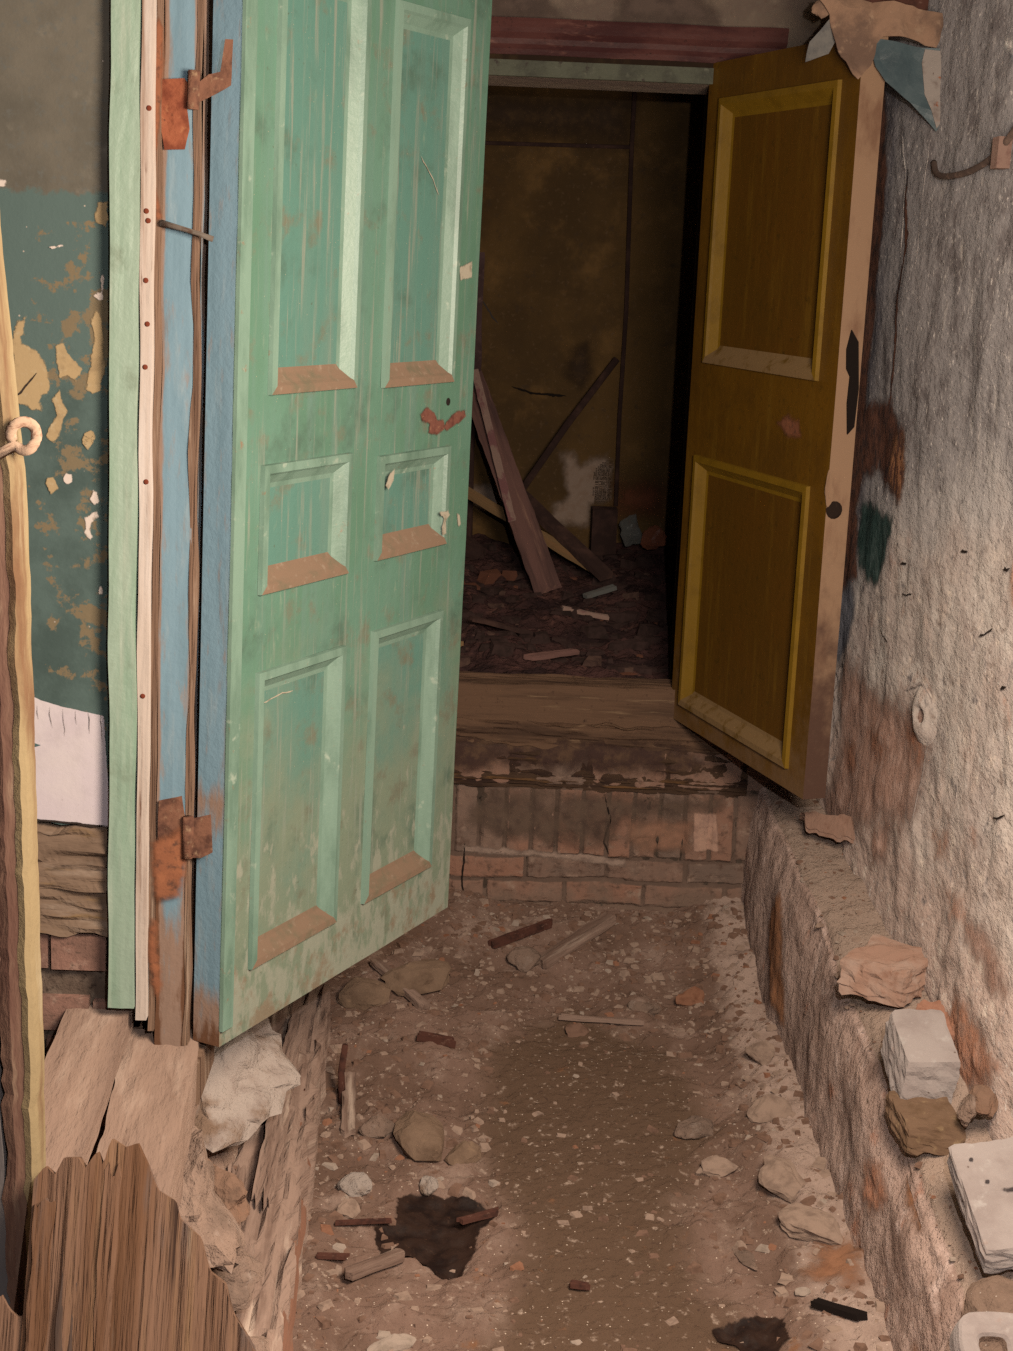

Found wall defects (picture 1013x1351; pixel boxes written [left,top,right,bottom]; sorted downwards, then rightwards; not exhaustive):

peeling [95,202,108,227]
peeling [13,275,105,443]
peeling [82,431,95,450]
peeling [46,473,72,494]
peeling [84,490,99,539]
peeling [34,697,109,937]
rust [152,829,186,900]
rust [148,920,162,996]